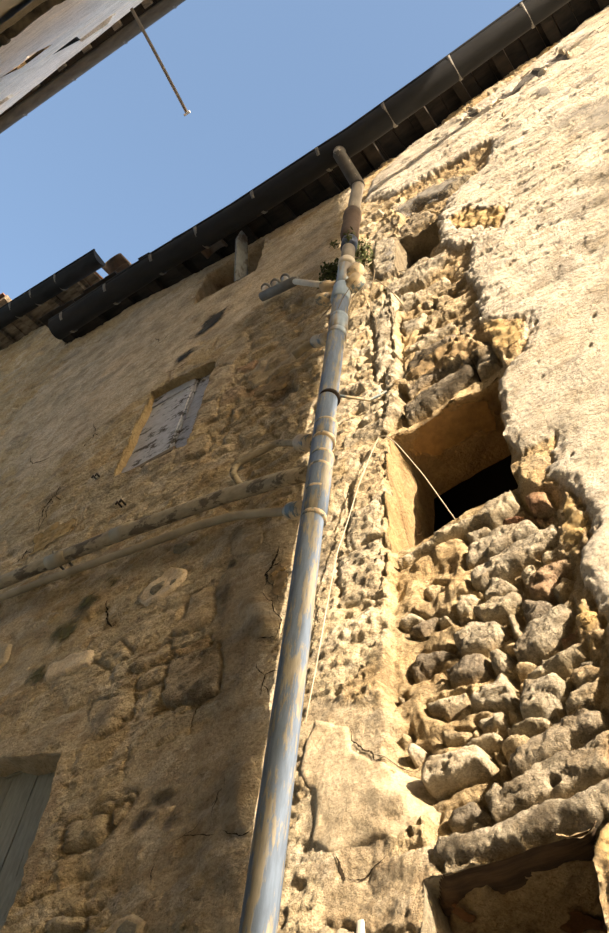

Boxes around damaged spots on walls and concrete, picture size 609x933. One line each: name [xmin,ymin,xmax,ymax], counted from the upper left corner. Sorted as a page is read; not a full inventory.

spalling [452,205,503,228]
spalling [483,318,523,347]
spalling [394,335,483,383]
spalling [562,498,591,554]
crack [264,546,282,599]
spalling [575,604,597,635]
crack [350,729,418,773]
crack [336,856,384,881]